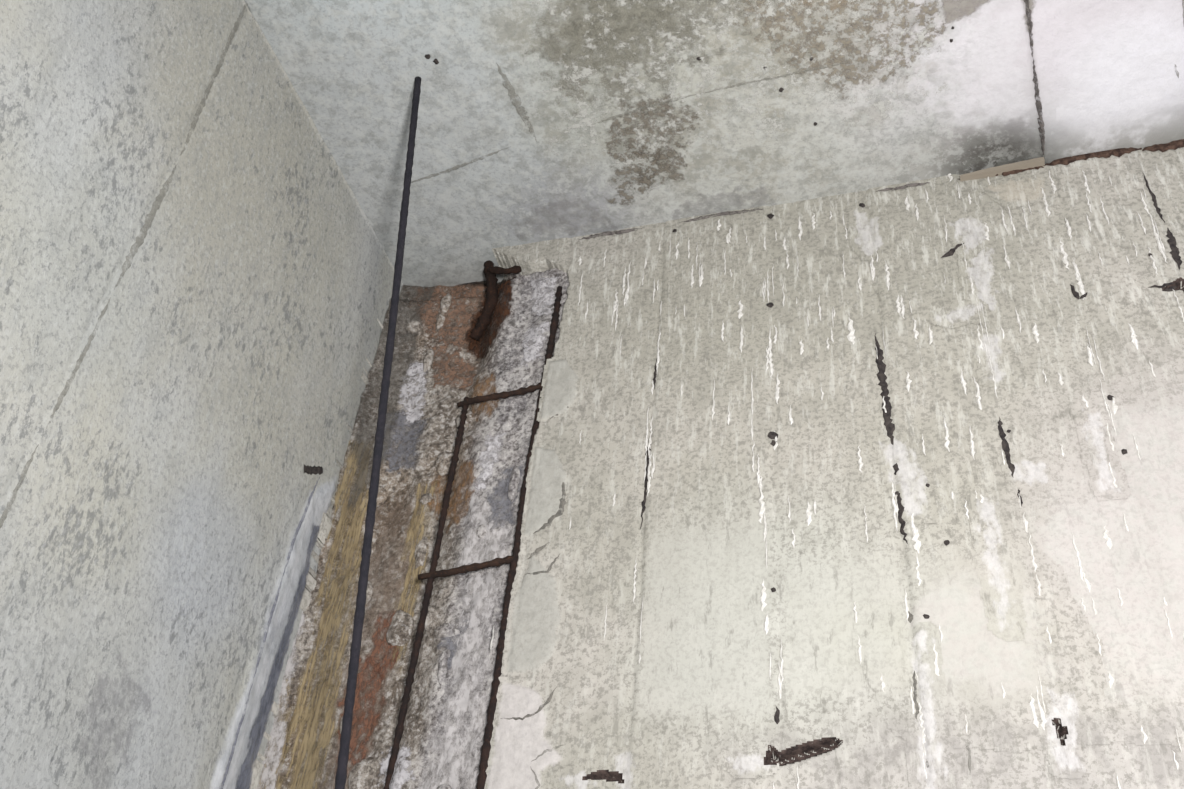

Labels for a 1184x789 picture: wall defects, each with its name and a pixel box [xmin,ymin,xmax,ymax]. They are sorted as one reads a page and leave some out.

water stain [894,0,1184,221]
crack [995,0,1184,291]
rust [407,276,516,421]
spalling [1162,277,1184,291]
spalling [257,260,582,789]
crack [875,333,908,544]
crack [998,417,1023,506]
water stain [857,434,956,789]
water stain [550,742,643,789]
spalling [582,770,624,783]
spalling [764,737,843,766]
water stain [1029,673,1093,779]